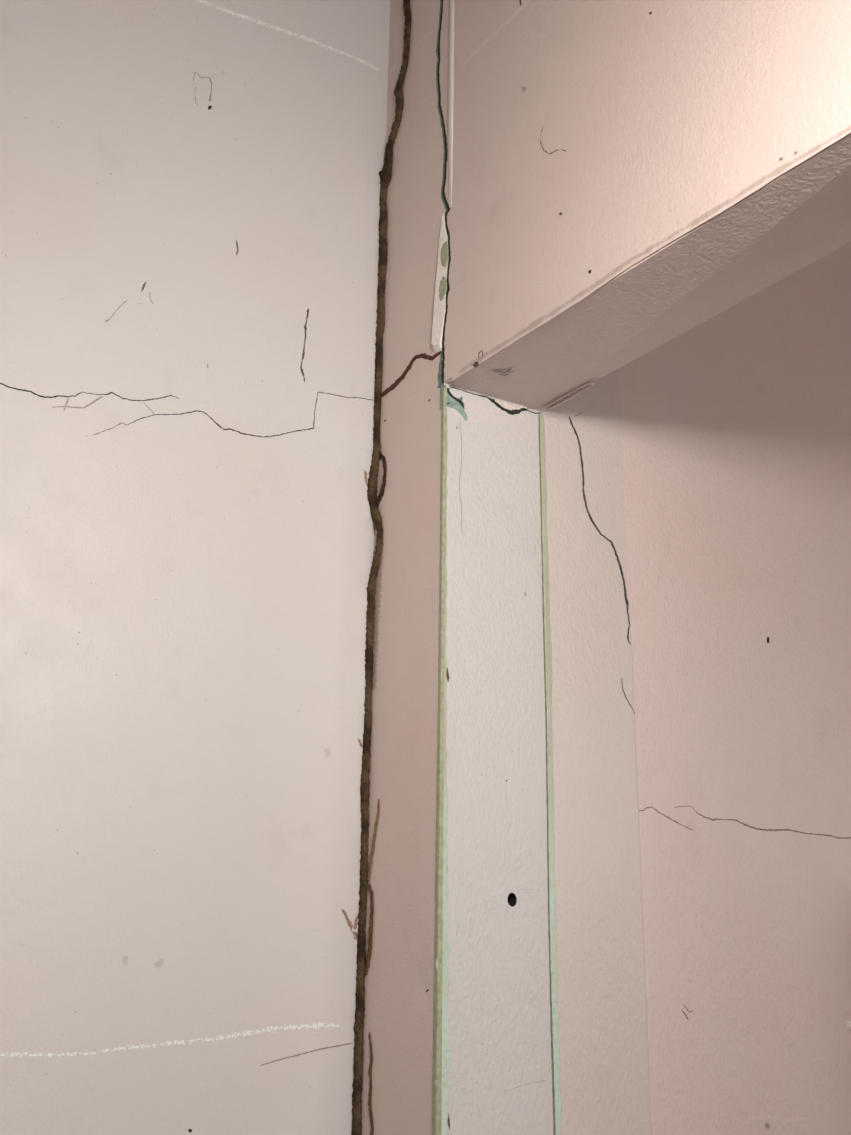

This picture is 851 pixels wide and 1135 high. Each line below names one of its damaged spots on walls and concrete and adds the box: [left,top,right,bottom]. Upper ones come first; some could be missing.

crack [540,124,567,155]
crack [436,0,541,415]
crack [104,282,154,323]
crack [0,308,373,437]
crack [455,420,463,538]
crack [569,410,631,644]
crack [639,806,851,839]